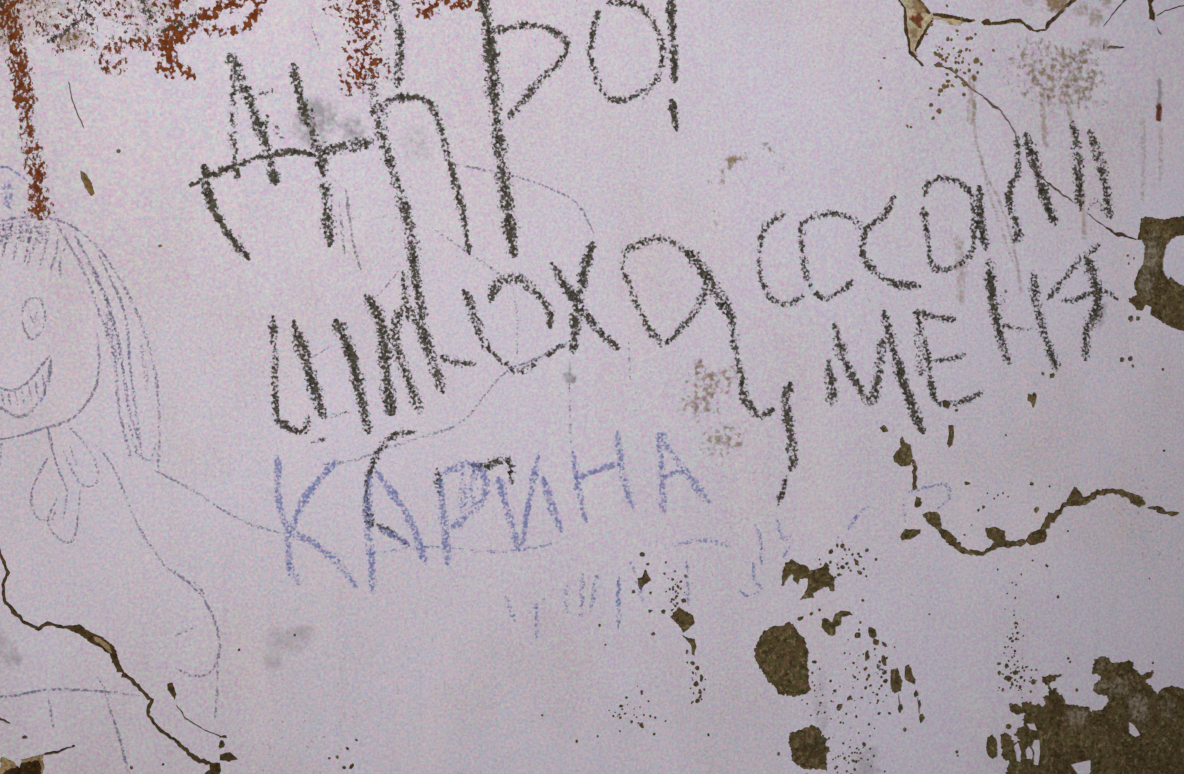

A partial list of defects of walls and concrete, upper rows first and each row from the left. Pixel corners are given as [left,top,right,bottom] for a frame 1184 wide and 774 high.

crack [1103,0,1184,49]
crack [898,0,1136,240]
peeling [1127,216,1184,331]
crack [893,437,1179,556]
spalling [781,559,835,600]
spalling [0,745,75,774]
crack [0,549,237,774]
spalling [754,616,817,697]
spalling [788,725,830,771]
spalling [986,656,1184,774]